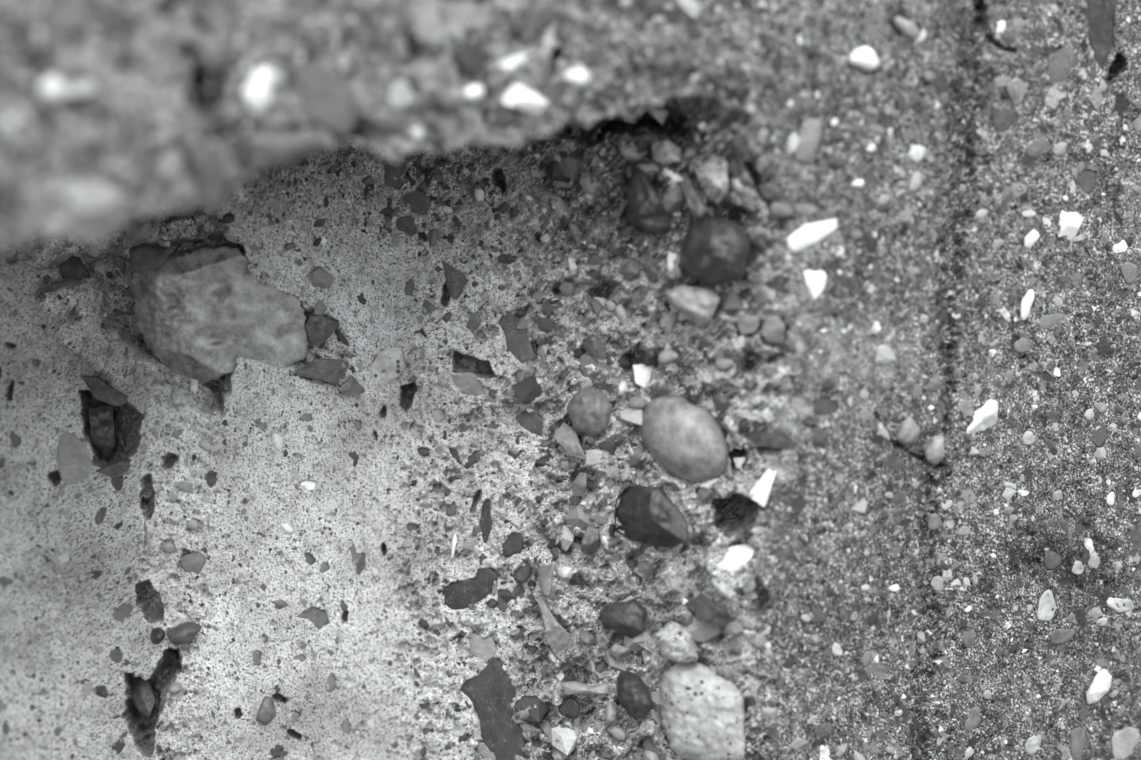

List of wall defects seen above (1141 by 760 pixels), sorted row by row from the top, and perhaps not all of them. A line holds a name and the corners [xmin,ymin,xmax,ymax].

spalling [409,0,478,38]
peeling [843,121,939,225]
peeling [974,169,1040,249]
peeling [1050,117,1110,174]
spalling [309,33,879,760]
peeling [871,321,901,370]
crack [873,0,1019,760]
spalling [0,185,363,760]
peeling [967,474,1033,530]
peeling [852,557,917,647]
peeling [934,559,971,586]
peeling [1032,475,1141,760]